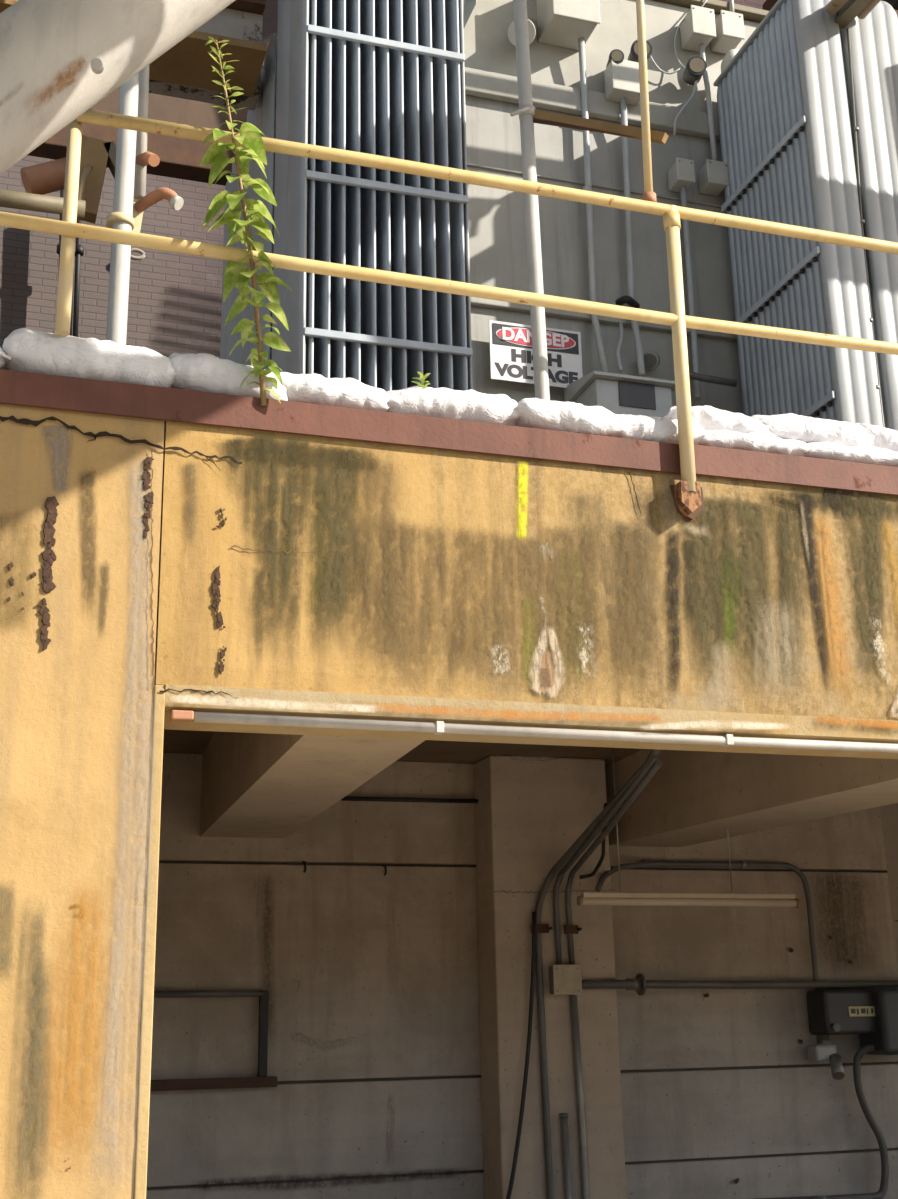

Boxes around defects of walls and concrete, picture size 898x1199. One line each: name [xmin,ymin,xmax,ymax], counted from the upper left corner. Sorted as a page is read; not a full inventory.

spalling [7,426,70,651]
crack [0,415,242,699]
spalling [142,456,154,539]
leakage [186,464,195,521]
spalling [211,565,226,628]
leakage [227,435,597,675]
leakage [668,489,898,685]
spalling [218,646,227,674]
leakage [175,695,375,712]
leakage [650,721,784,729]